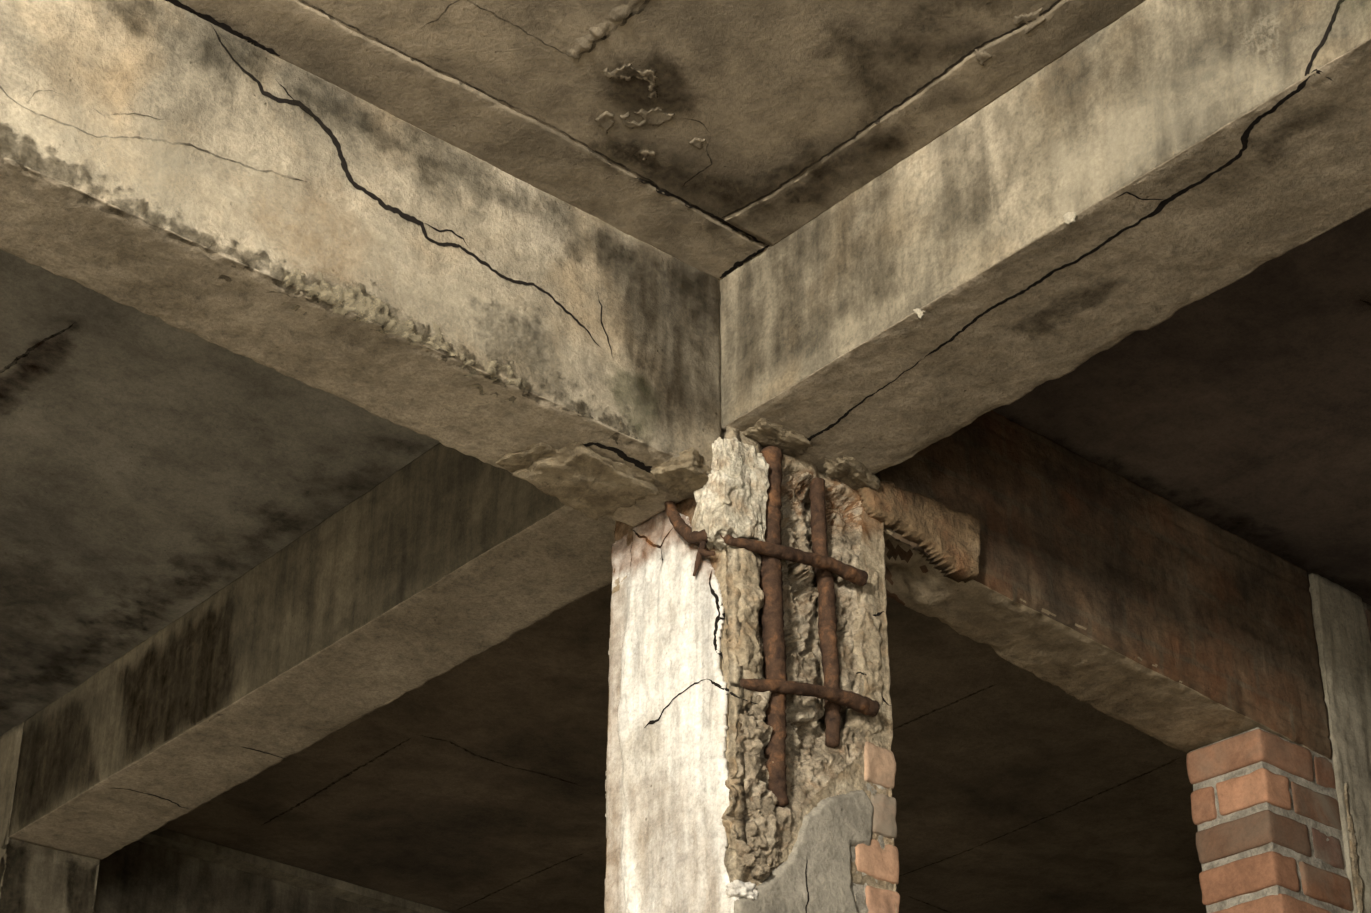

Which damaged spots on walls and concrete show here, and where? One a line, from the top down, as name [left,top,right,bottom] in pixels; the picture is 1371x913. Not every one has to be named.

crack [0,86,307,182]
crack [211,25,614,361]
water stain [609,54,685,111]
crack [807,0,1345,441]
crack [0,324,73,373]
crack [644,571,757,728]
spalling [721,418,900,913]